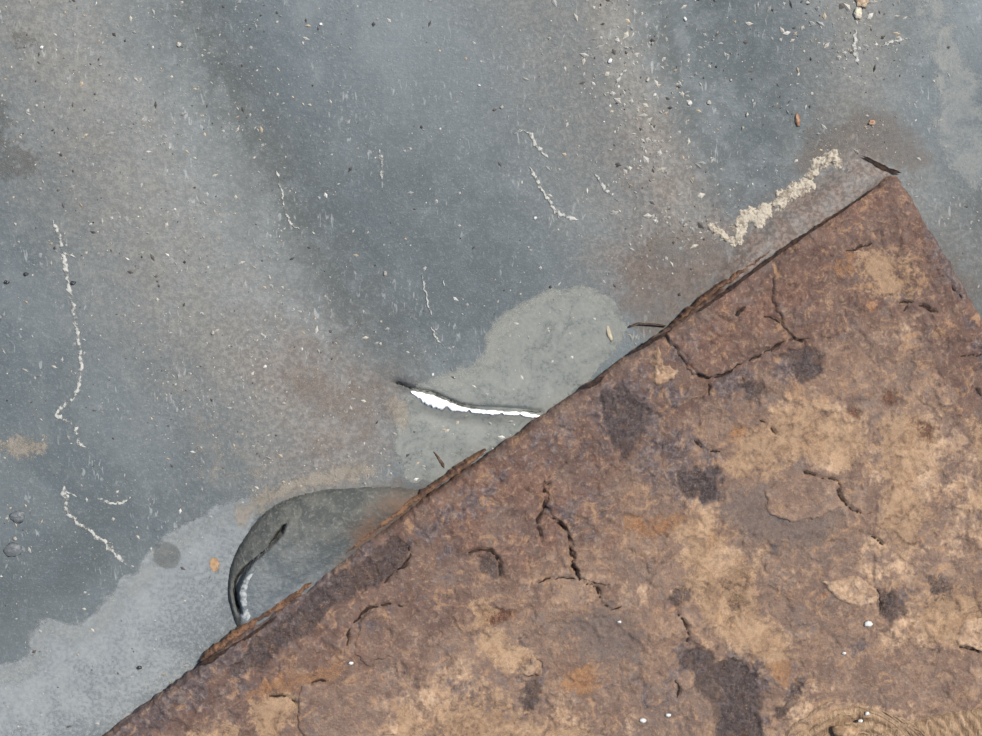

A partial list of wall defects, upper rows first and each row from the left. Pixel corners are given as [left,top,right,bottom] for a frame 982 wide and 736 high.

damp [707,149,843,248]
crack [53,221,85,447]
damp [394,286,628,483]
rust [651,311,754,385]
crack [60,486,131,565]
rust [543,458,628,585]
rust [763,475,843,523]
damp [0,499,259,736]
rust [516,655,542,677]
rust [822,576,879,608]
rust [955,618,982,653]